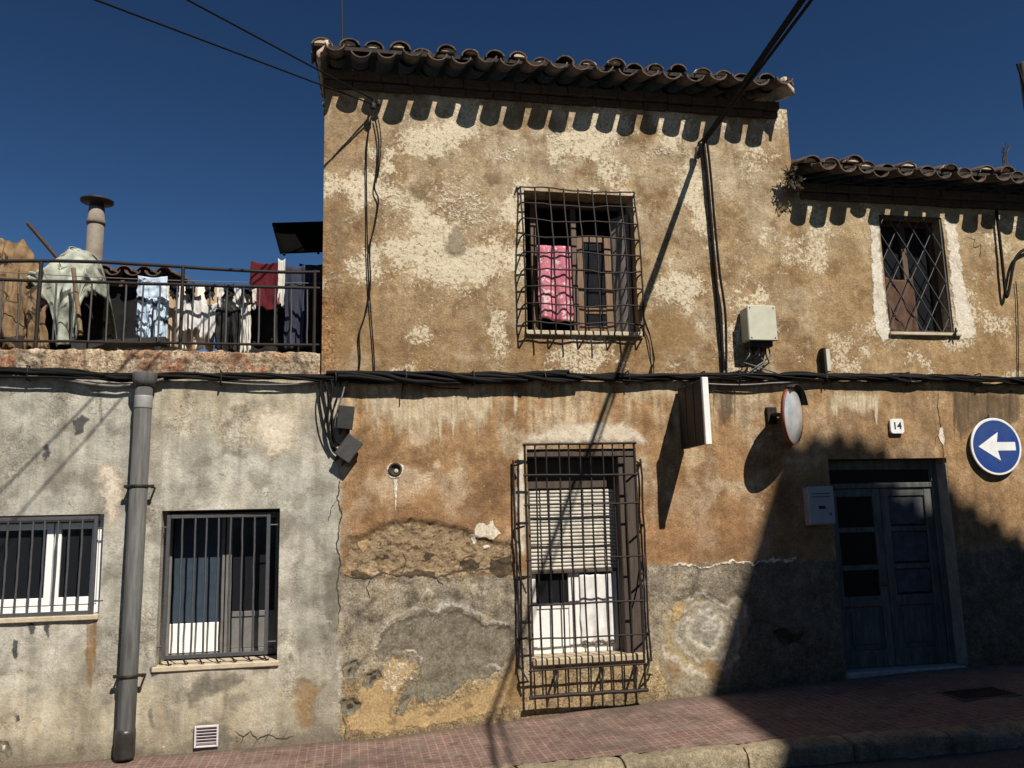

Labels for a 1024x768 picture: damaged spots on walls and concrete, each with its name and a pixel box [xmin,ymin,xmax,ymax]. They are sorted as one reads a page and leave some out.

peeling [382,180,492,267]
crack [328,471,510,632]
flaking render [341,463,515,583]
crack [235,730,293,743]
spalling [343,656,519,738]
leakage [661,592,749,698]